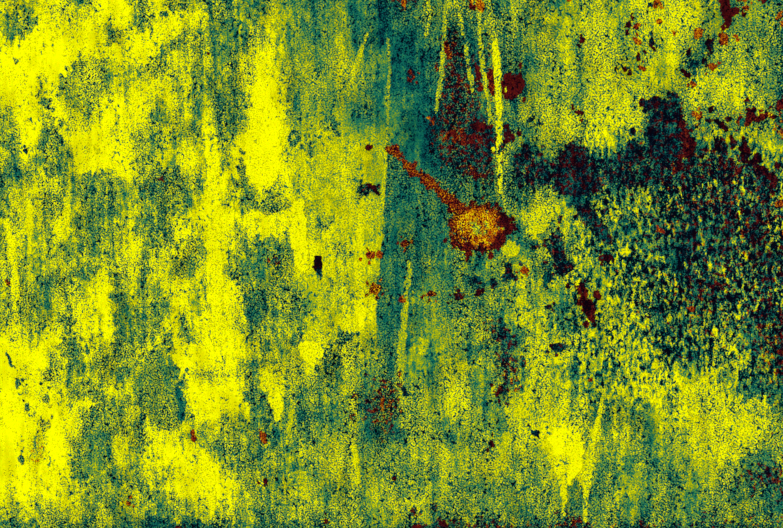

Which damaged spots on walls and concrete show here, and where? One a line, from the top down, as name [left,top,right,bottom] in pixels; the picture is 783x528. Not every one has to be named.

corrosion [390,0,429,12]
corrosion [718,0,767,46]
corrosion [426,23,526,185]
corrosion [736,97,783,139]
corrosion [384,143,517,262]